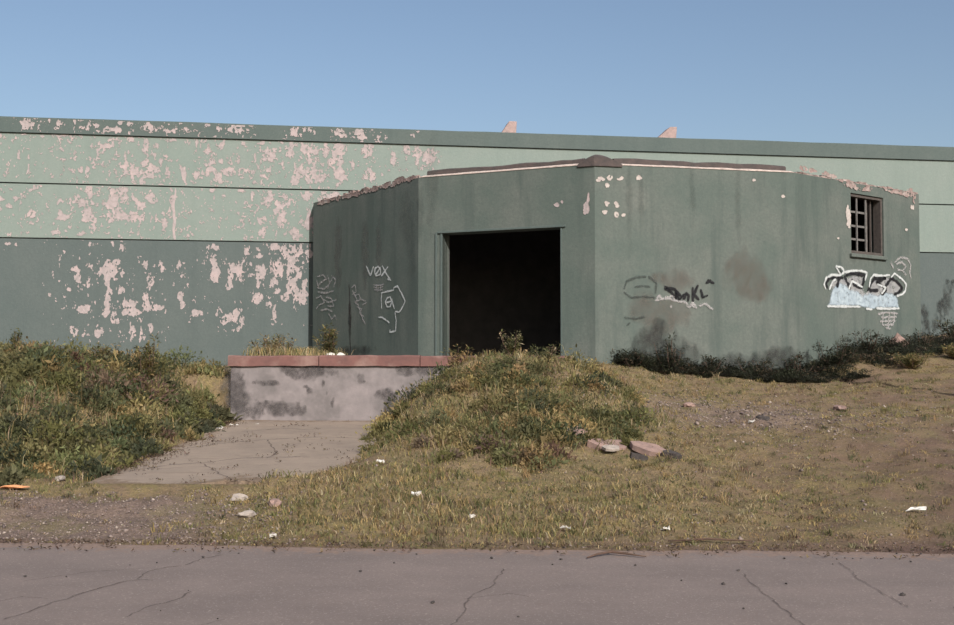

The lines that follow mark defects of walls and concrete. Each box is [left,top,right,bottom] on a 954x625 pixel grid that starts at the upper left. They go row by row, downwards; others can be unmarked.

spalling [794,165,918,210]
peeling [0,117,440,343]
damp [221,368,301,415]
damp [282,366,324,392]